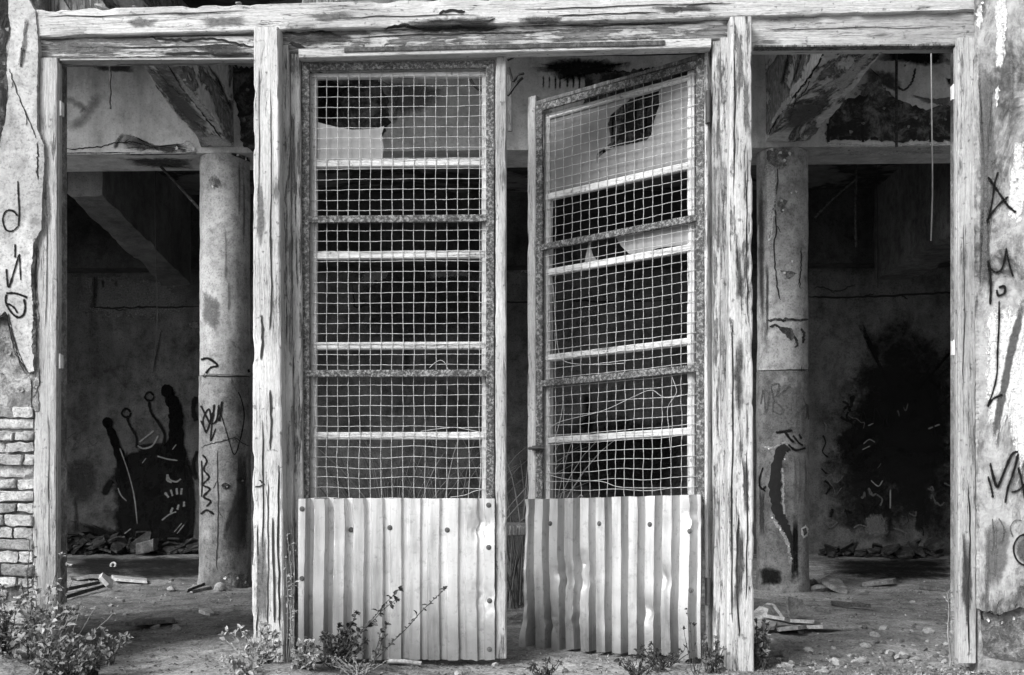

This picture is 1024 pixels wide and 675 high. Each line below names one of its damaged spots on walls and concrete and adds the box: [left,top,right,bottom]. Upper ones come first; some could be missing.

peeling [386,9,497,32]
peeling [522,16,560,24]
peeling [975,0,1008,67]
spalling [128,17,255,162]
peeling [770,95,792,127]
spalling [825,80,950,155]
peeling [1008,142,1024,223]
spalling [0,238,39,411]
spalling [961,540,1024,662]